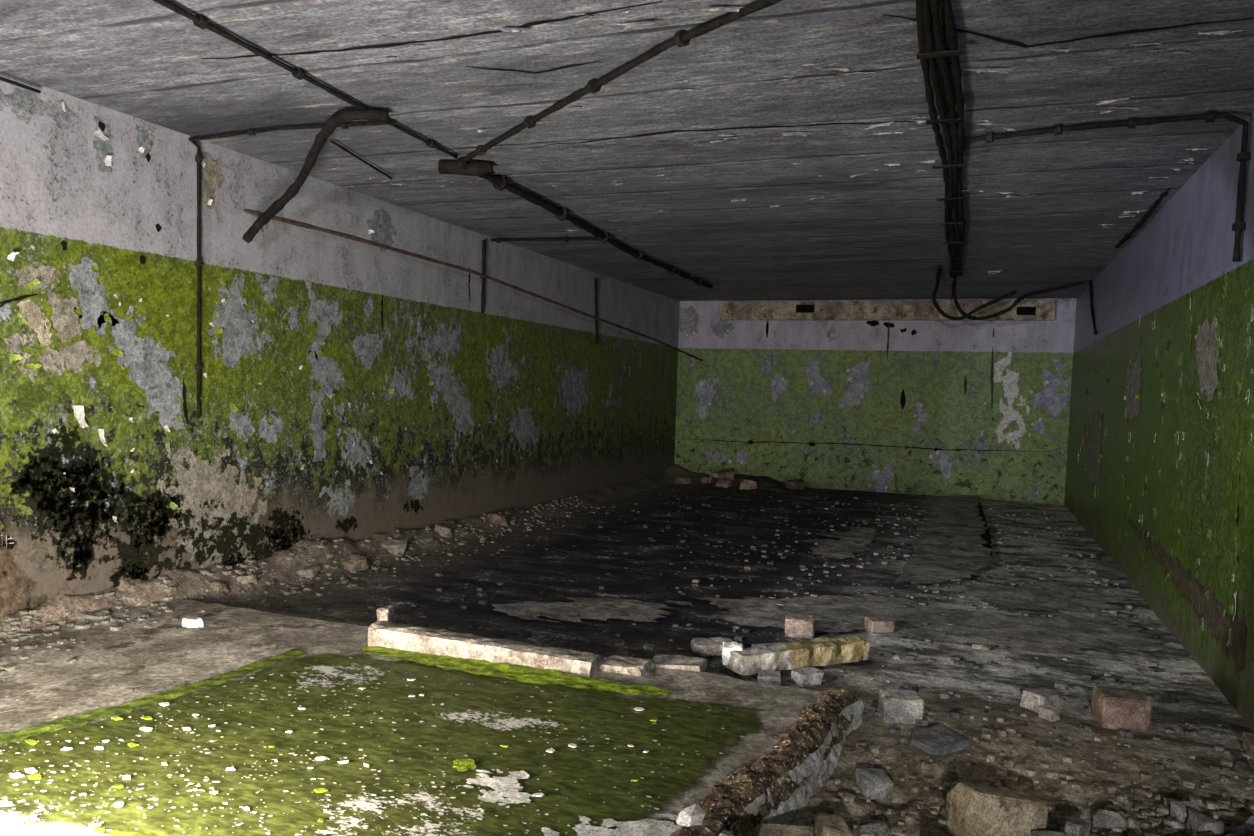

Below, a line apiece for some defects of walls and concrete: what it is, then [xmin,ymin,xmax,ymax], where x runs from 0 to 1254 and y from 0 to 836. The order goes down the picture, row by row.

peeling [0,88,78,130]
peeling [93,116,114,172]
peeling [0,241,283,569]
peeling [283,294,383,517]
peeling [357,332,414,409]
peeling [410,315,491,439]
peeling [484,336,540,460]
peeling [984,277,1225,559]
damp [0,415,358,618]
damp [403,498,423,516]
peeling [895,495,995,584]
damp [492,583,1184,654]